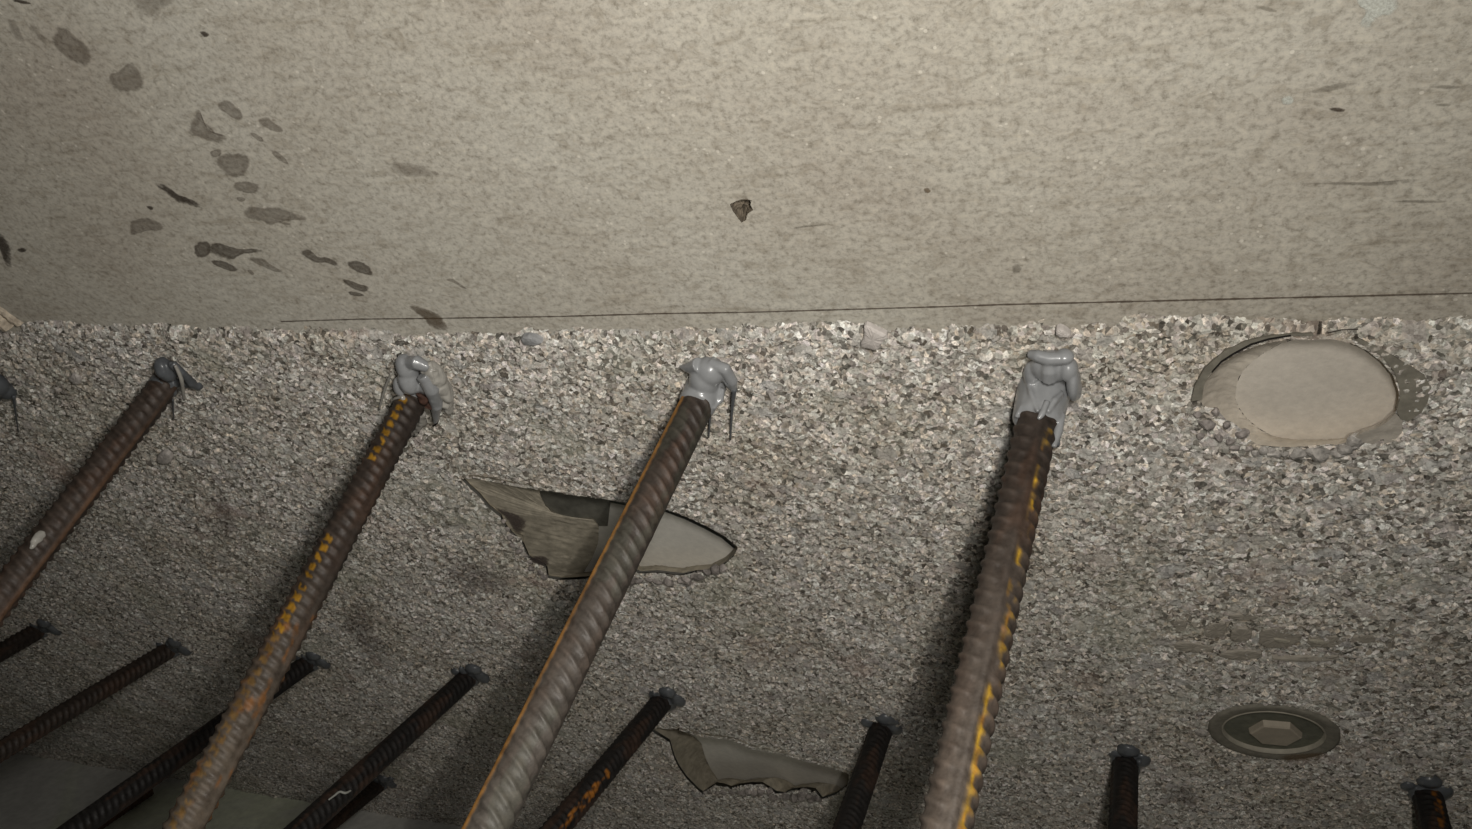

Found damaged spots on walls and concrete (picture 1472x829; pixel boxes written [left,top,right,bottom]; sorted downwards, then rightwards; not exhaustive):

damp [159,185,198,207]
damp [195,242,257,271]
damp [303,250,372,296]
damp [416,309,444,327]
spalling [0,357,203,662]
spalling [56,354,454,829]
spalling [461,356,738,829]
spalling [919,324,1082,829]
spalling [284,663,490,829]
spalling [832,713,903,829]
spalling [1108,744,1151,829]
spalling [1400,775,1454,829]